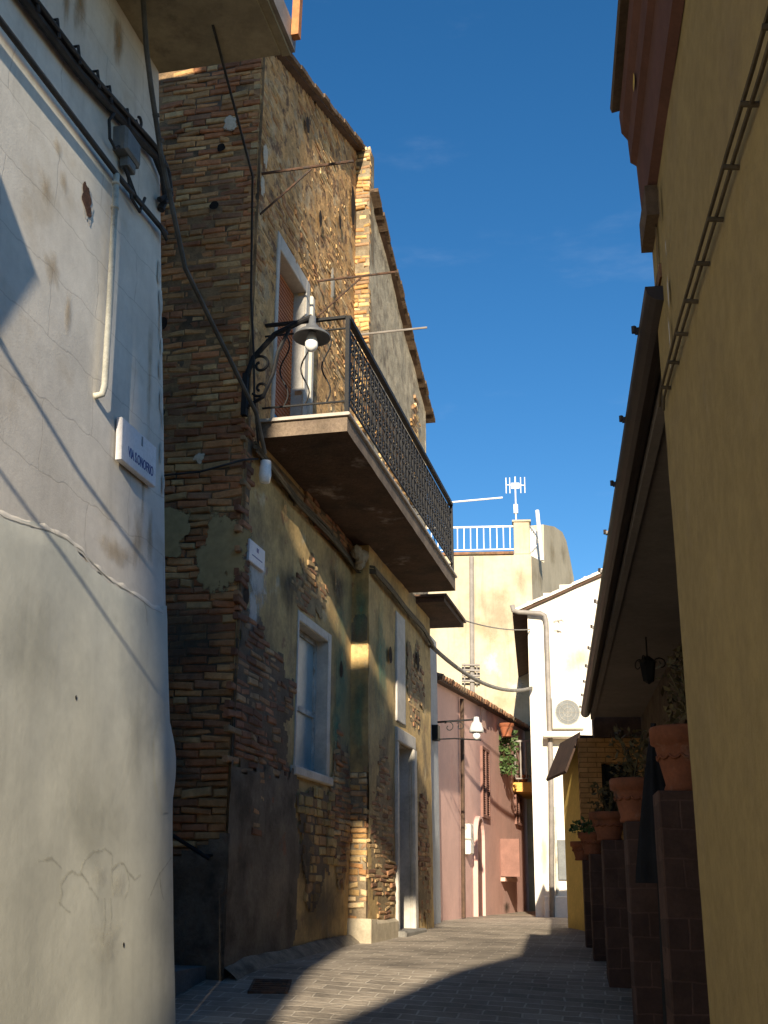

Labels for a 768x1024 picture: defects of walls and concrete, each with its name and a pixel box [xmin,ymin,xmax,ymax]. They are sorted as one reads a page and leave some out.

spalling [222,416,369,837]
spalling [405,640,425,735]
spalling [296,724,353,912]
spalling [364,737,397,920]